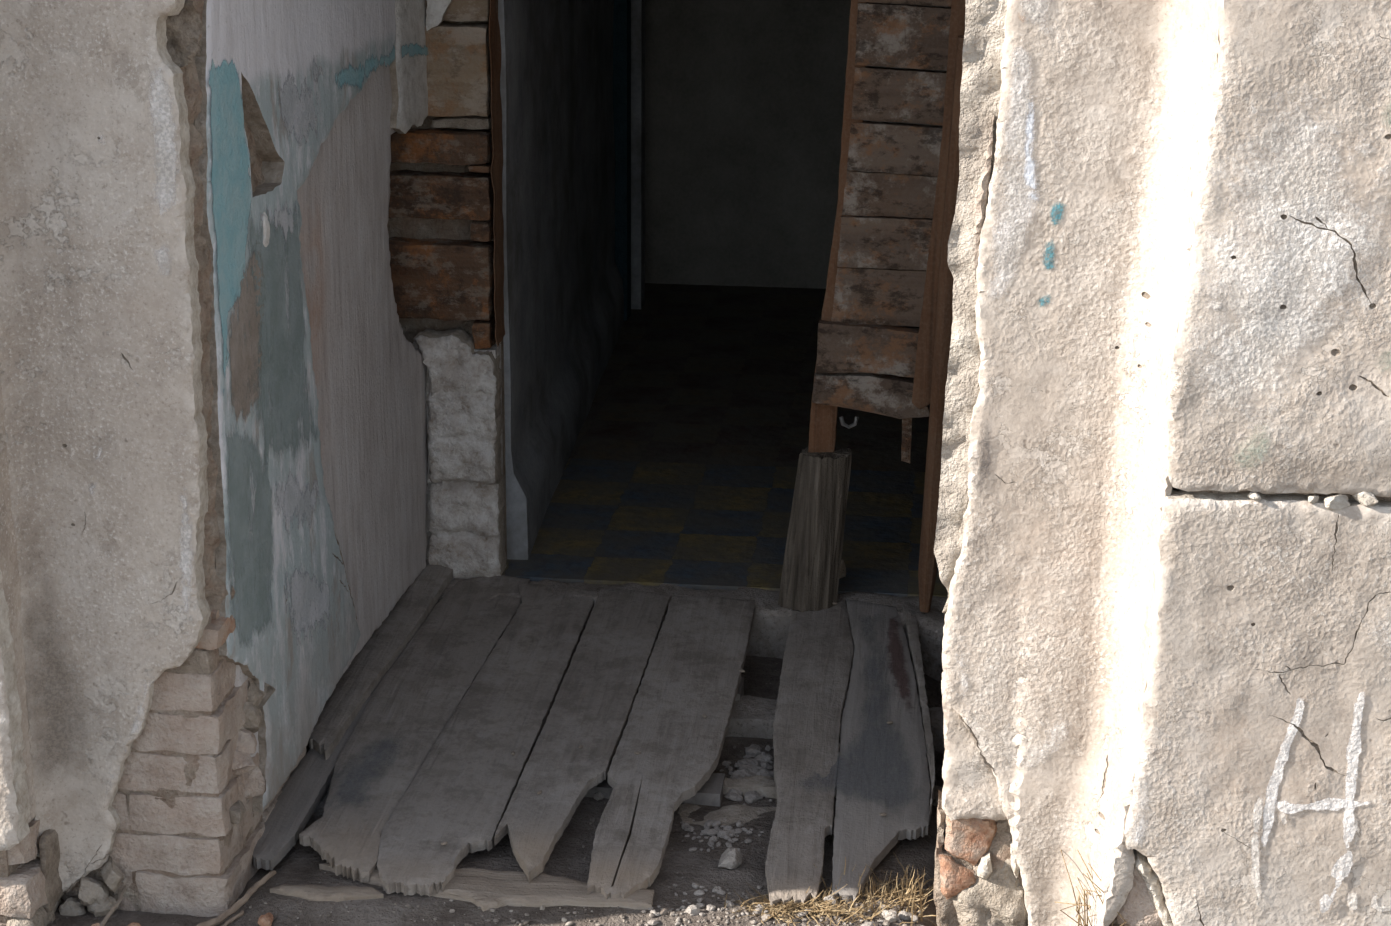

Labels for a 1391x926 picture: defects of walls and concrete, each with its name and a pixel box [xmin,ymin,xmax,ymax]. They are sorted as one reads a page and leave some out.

peeling [313,43,429,89]
crack [1289,215,1373,306]
spalling [0,0,317,926]
crack [1259,592,1389,789]
spalling [933,696,1028,926]
spalling [1109,849,1173,926]